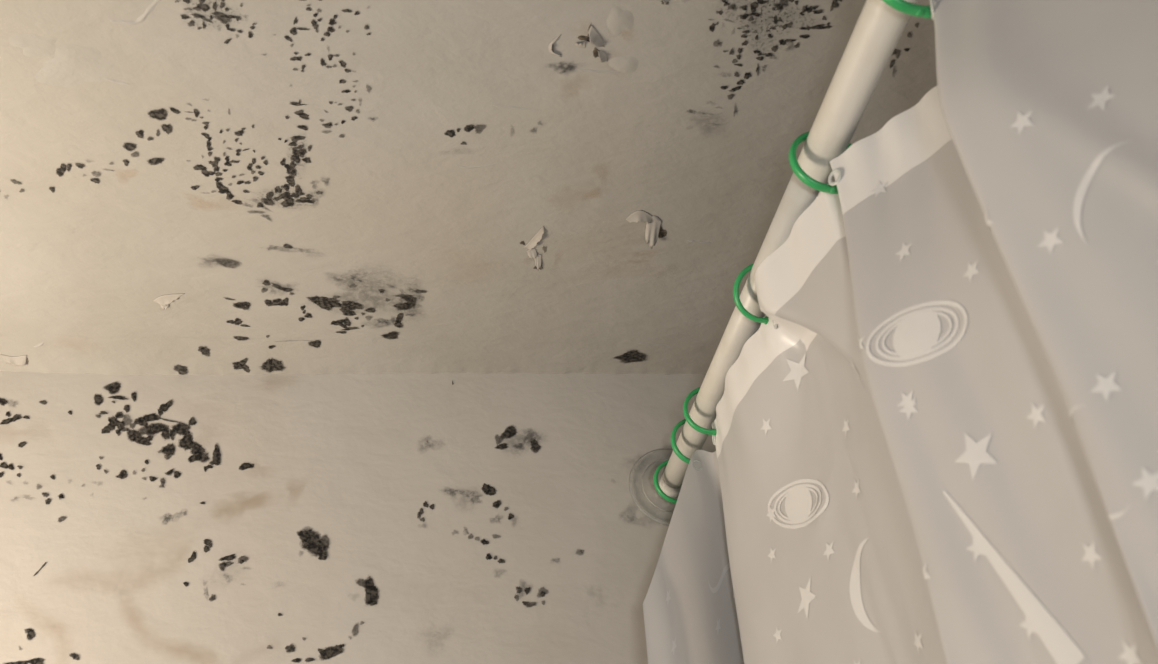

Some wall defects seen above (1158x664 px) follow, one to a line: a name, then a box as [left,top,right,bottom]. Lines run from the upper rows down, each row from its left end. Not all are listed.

peeling [575,25,607,63]
water stain [709,0,842,114]
water stain [123,0,370,220]
peeling [520,226,545,270]
peeling [626,210,667,248]
water stain [262,280,427,339]
water stain [233,335,285,373]
water stain [94,382,221,488]
water stain [297,528,329,560]
water stain [357,576,379,606]
water stain [5,629,44,664]
water stain [267,621,364,662]